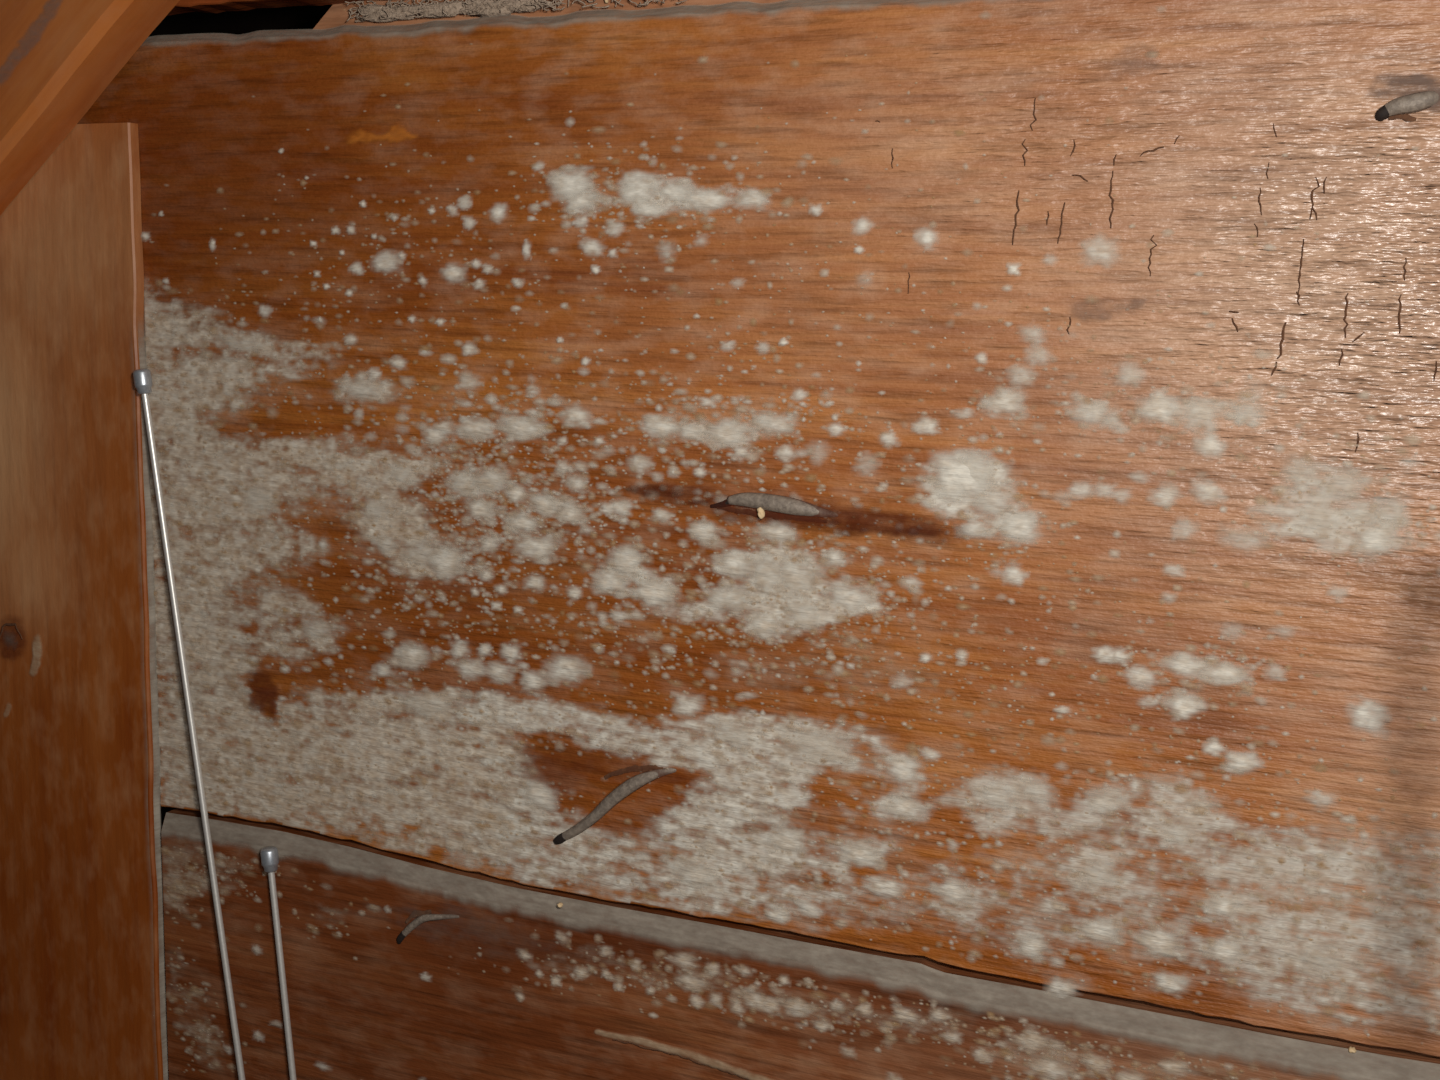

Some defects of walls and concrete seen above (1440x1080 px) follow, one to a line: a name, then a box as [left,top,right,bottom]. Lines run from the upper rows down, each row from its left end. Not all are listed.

water stain [427,128,829,298]
water stain [917,189,951,244]
crack [1012,98,1180,245]
crack [1148,235,1157,276]
crack [1254,123,1277,237]
crack [1271,177,1327,375]
crack [1339,293,1365,366]
crack [1398,250,1440,334]
water stain [144,214,1440,1036]
water stain [520,937,1190,1080]